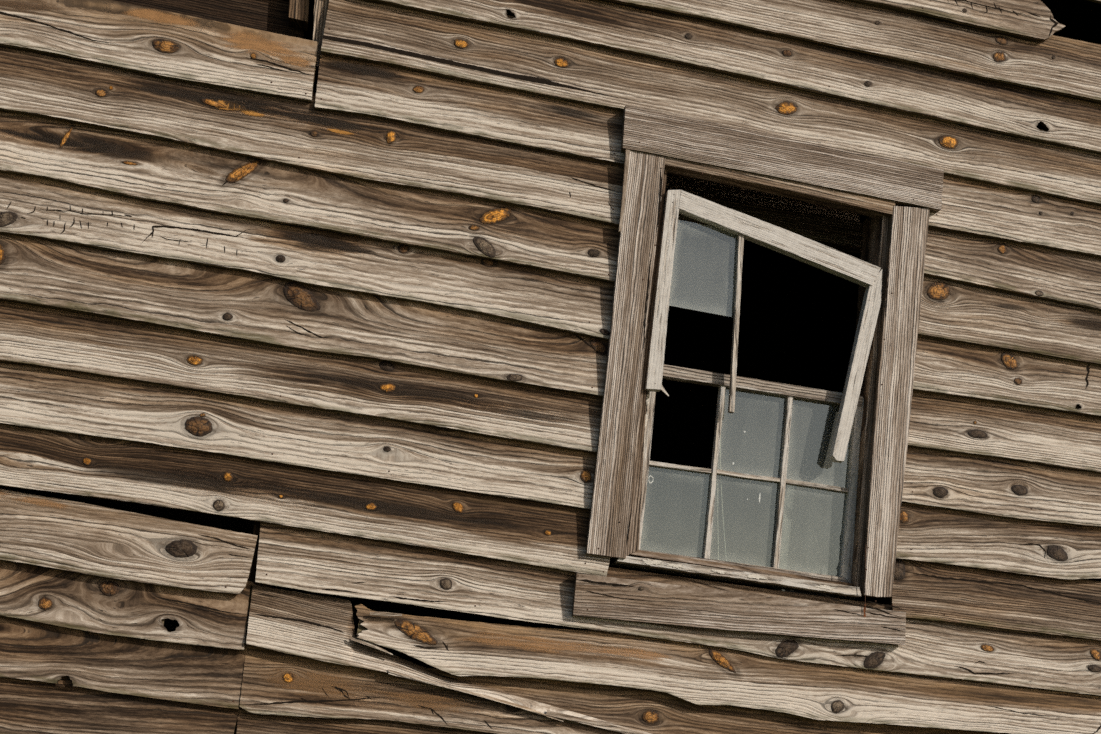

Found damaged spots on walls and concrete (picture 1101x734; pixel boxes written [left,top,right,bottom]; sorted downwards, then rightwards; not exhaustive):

crack [955,0,1058,36]
crack [7,202,250,253]